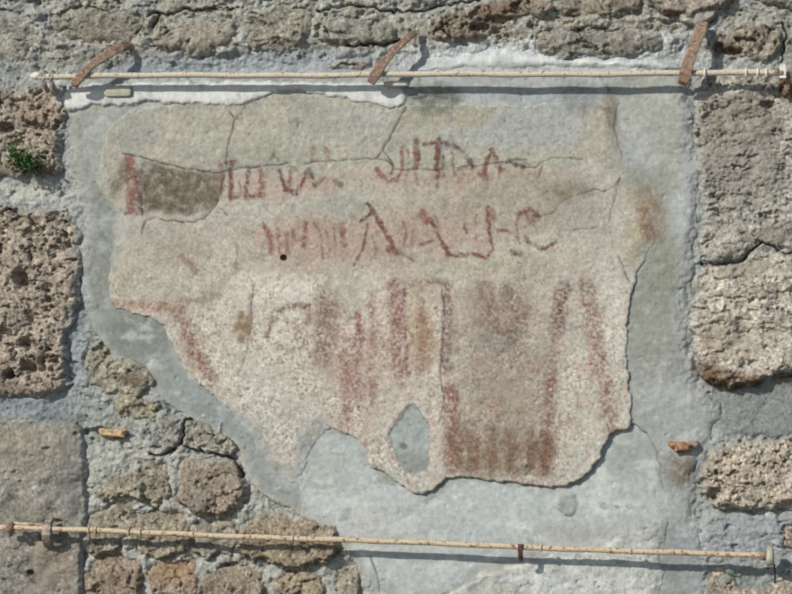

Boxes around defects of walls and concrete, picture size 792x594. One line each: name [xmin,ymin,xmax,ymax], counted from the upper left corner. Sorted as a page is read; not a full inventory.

spalling [87,307,669,594]